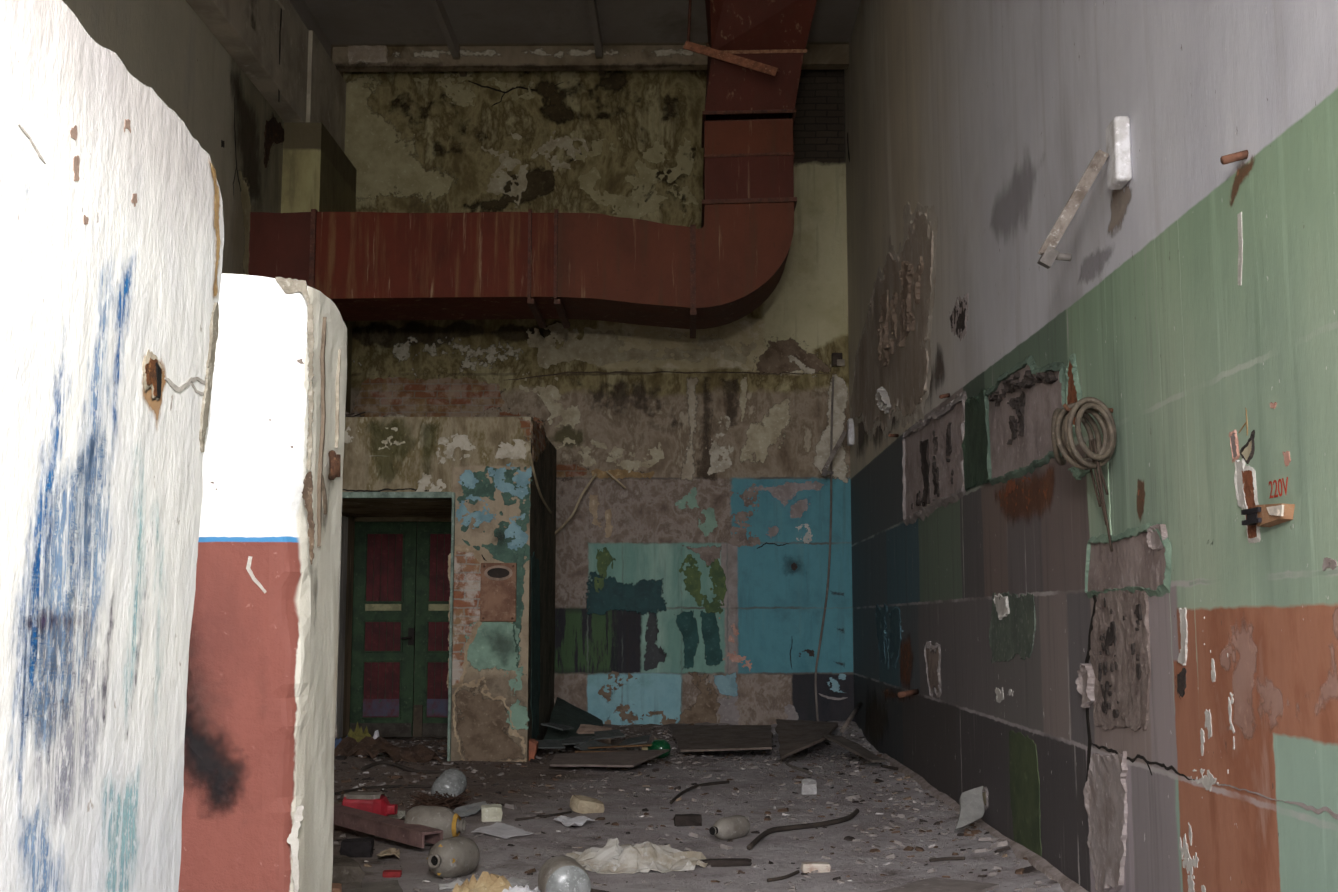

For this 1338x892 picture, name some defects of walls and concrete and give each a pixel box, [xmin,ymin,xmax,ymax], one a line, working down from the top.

leakage [336,49,501,69]
leakage [391,93,456,123]
leakage [519,48,693,125]
leakage [464,167,555,212]
leakage [633,169,694,212]
crack [164,377,206,395]
flaking render [344,202,1090,762]
crack [1085,595,1097,663]
flaking render [1076,523,1172,731]
peeling [1175,608,1188,699]
crack [1086,708,1338,820]
flaking render [1083,751,1128,892]